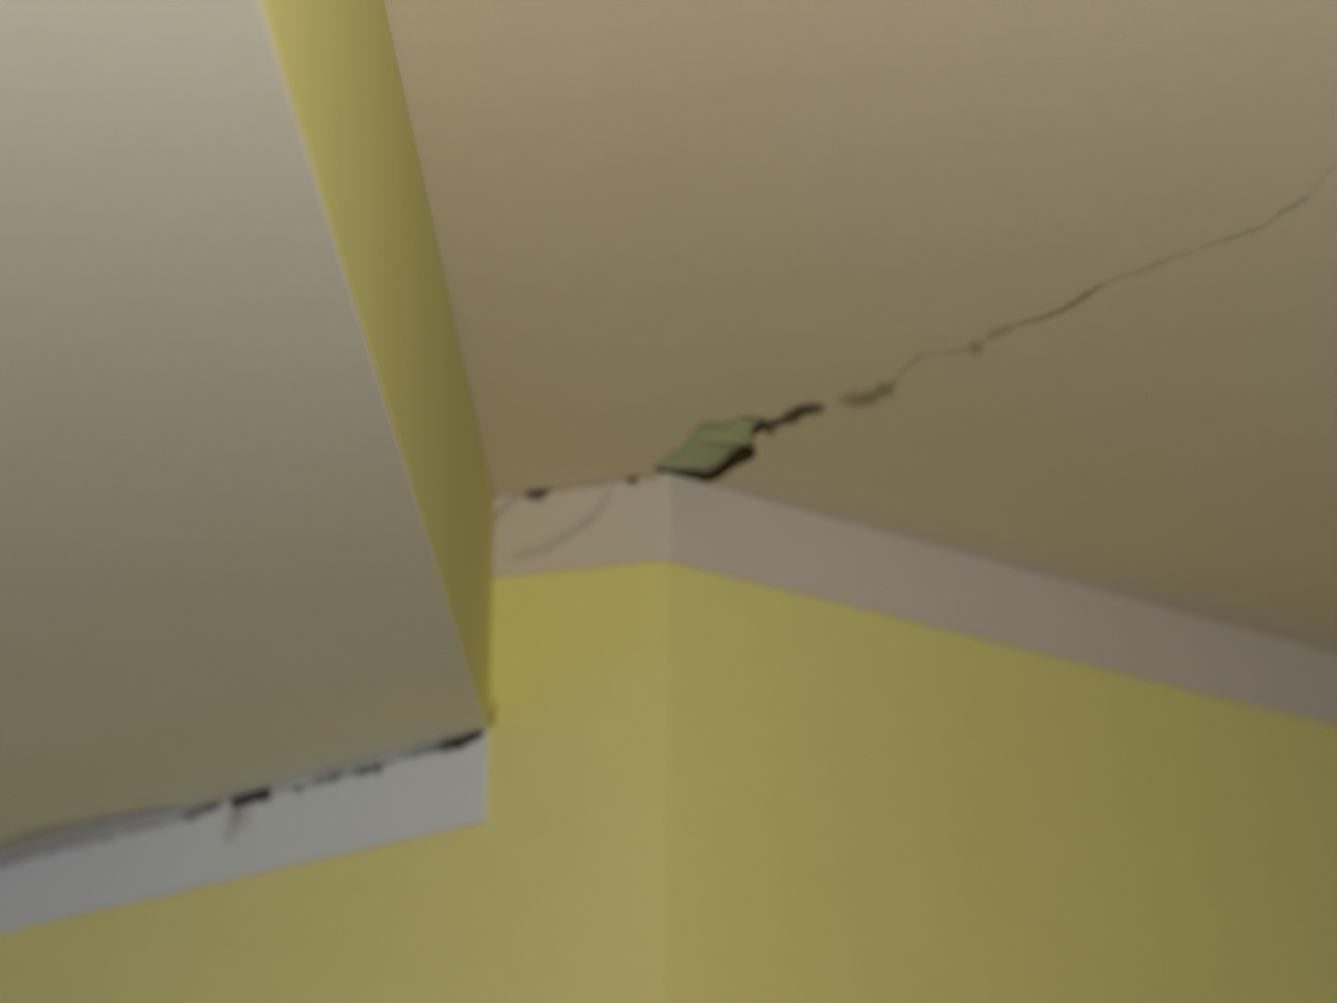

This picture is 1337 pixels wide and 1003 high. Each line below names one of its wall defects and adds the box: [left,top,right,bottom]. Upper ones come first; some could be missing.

crack [761,405,820,433]
spalling [654,416,764,483]
crack [527,489,550,499]
crack [436,730,483,751]
crack [188,764,379,817]